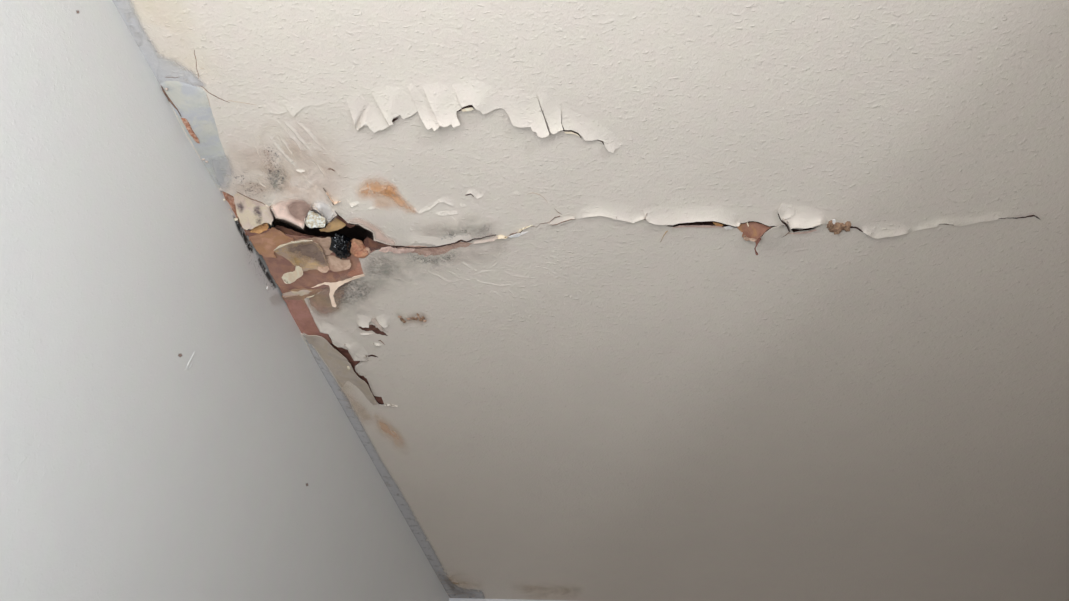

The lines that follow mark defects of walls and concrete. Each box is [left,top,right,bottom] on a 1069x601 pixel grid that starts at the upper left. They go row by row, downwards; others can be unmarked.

peeling [346,80,625,153]
peeling [233,193,274,230]
damp [235,148,305,227]
peeling [382,189,485,237]
crack [392,202,1039,257]
peeling [274,210,365,307]
peeling [354,312,427,346]